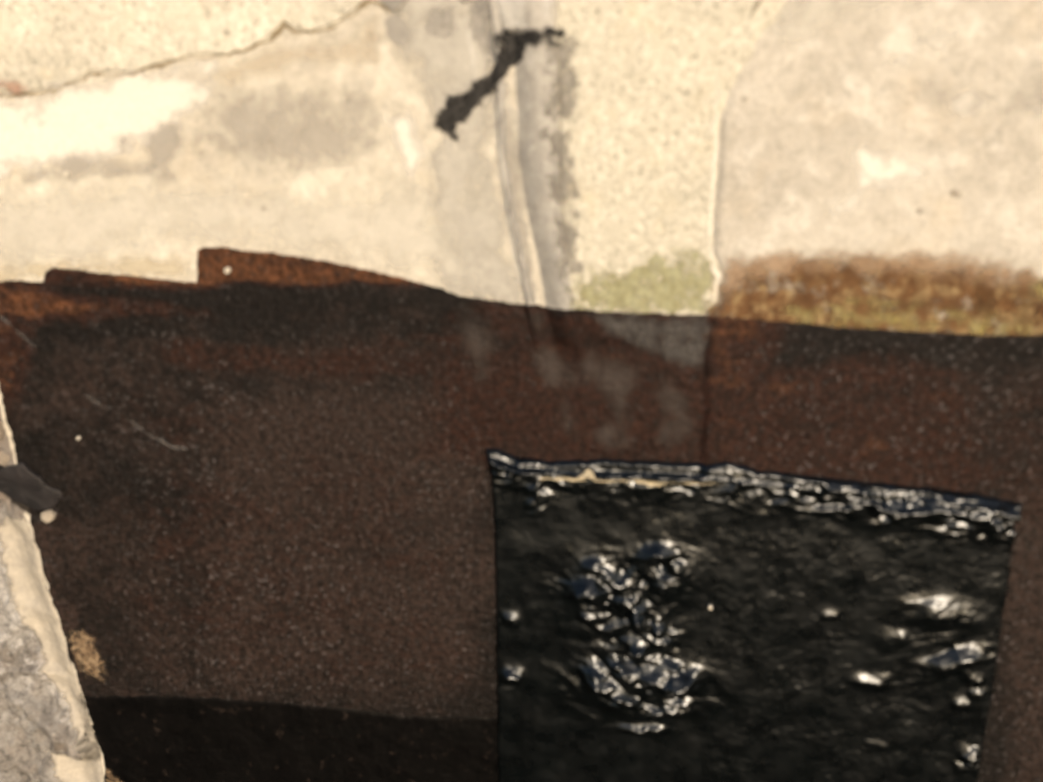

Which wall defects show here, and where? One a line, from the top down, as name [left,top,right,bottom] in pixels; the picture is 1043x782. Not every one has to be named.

crack [0,0,390,104]